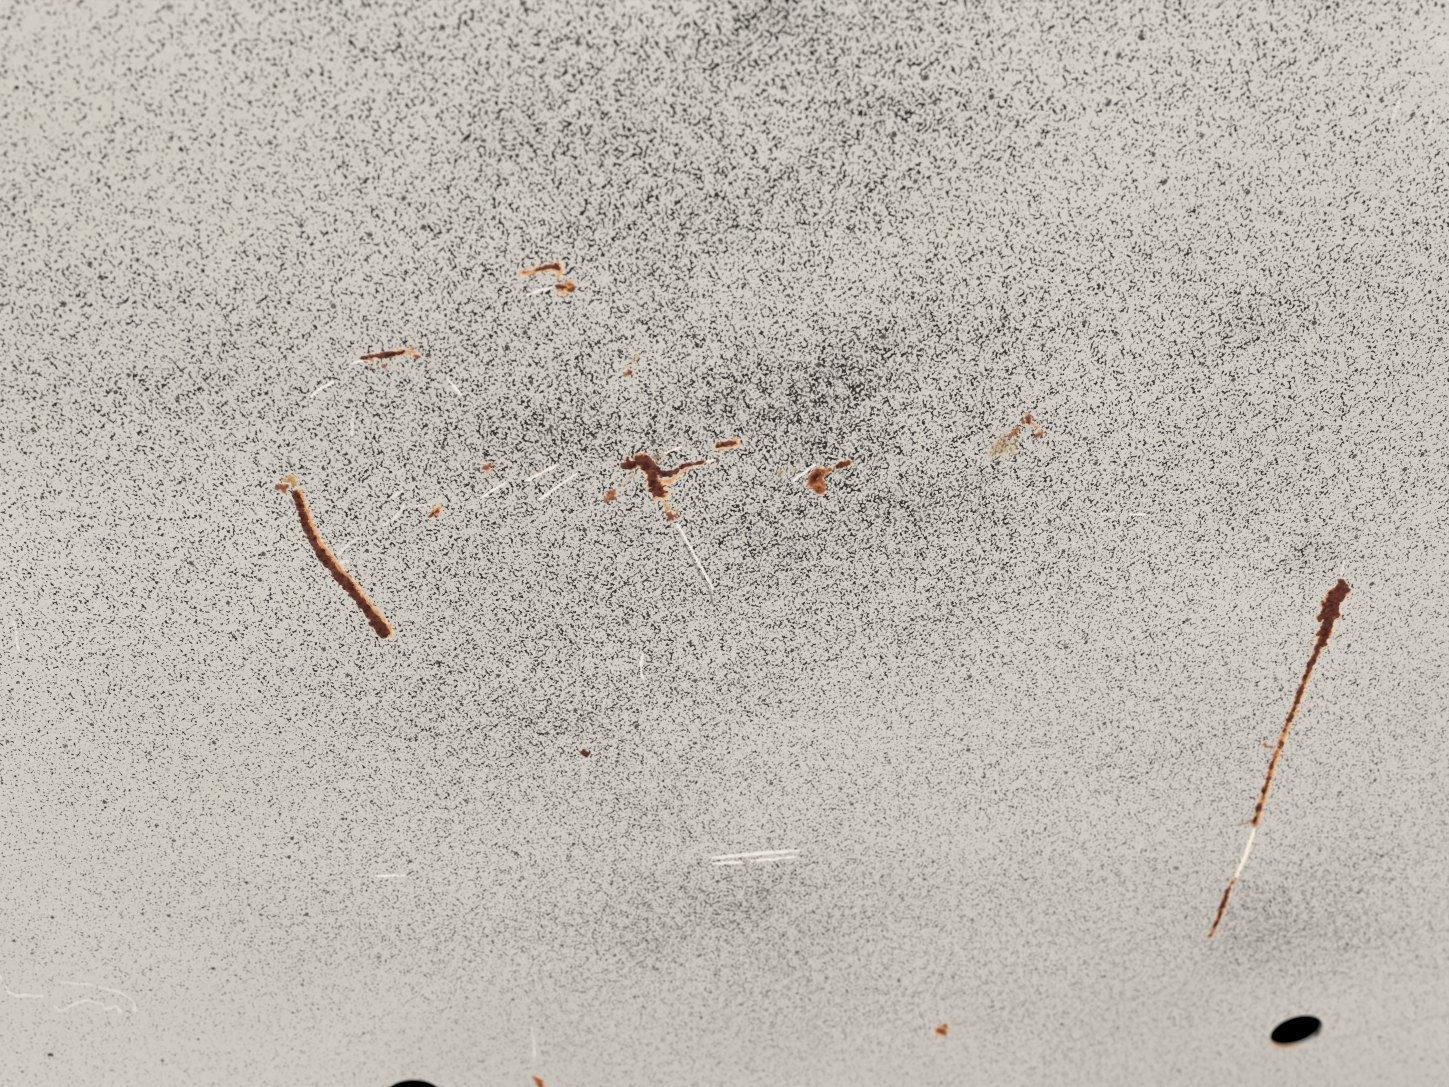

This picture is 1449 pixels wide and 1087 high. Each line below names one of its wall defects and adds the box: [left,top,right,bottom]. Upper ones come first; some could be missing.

corrosion [515,259,578,298]
corrosion [358,345,421,371]
corrosion [601,436,742,523]
corrosion [773,455,856,498]
corrosion [273,482,396,641]
corrosion [1250,577,1354,829]